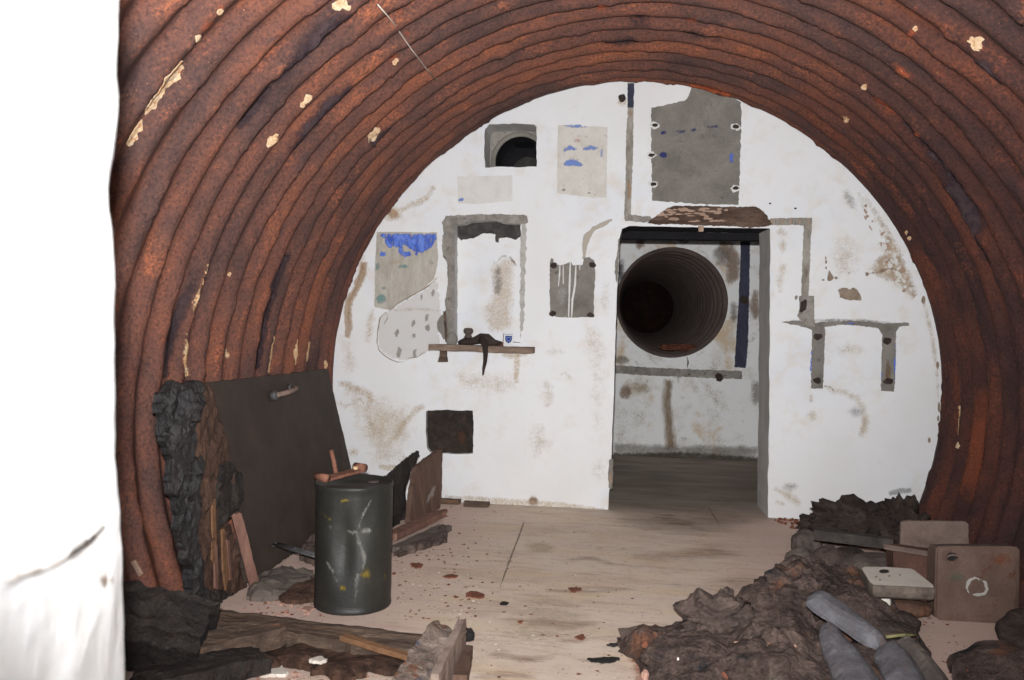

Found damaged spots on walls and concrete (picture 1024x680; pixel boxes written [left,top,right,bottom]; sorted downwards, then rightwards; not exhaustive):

peeling [126,60,184,146]
rust [238,13,347,128]
rust [291,87,351,150]
peeling [647,88,742,222]
rust [690,83,731,97]
rust [875,98,989,262]
rust [163,285,194,378]
rust [255,254,291,369]
peeling [374,175,528,339]
peeling [549,257,596,318]
water stain [613,382,758,461]